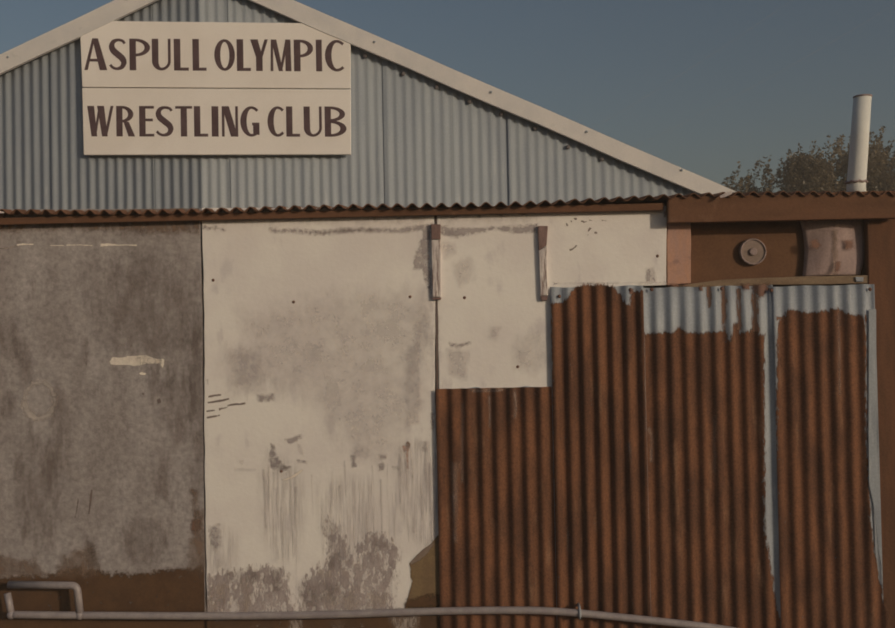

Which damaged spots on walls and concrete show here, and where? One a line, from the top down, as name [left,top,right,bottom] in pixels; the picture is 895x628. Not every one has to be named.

leakage [274,225,431,290]
leakage [441,224,537,236]
rust [436,283,889,628]